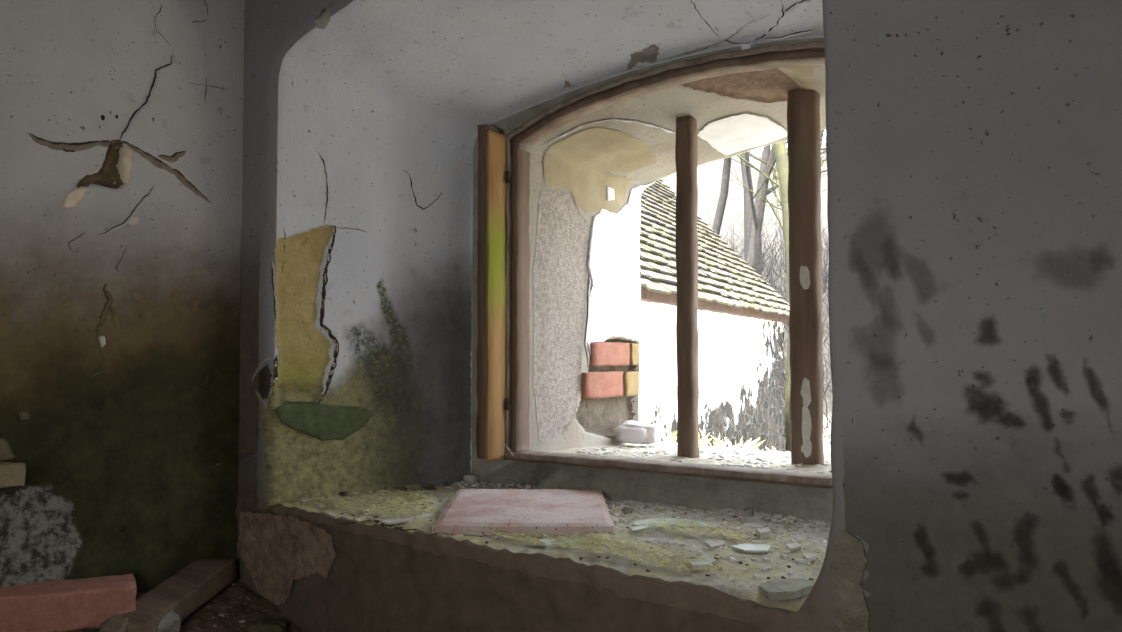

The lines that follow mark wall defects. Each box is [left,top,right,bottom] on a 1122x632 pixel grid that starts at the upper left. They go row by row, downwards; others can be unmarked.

crack [120,3,229,140]
crack [662,0,814,60]
spalling [62,140,133,208]
spalling [252,225,374,441]
damp [0,260,761,632]
spalling [533,127,656,441]
damp [1027,362,1063,429]